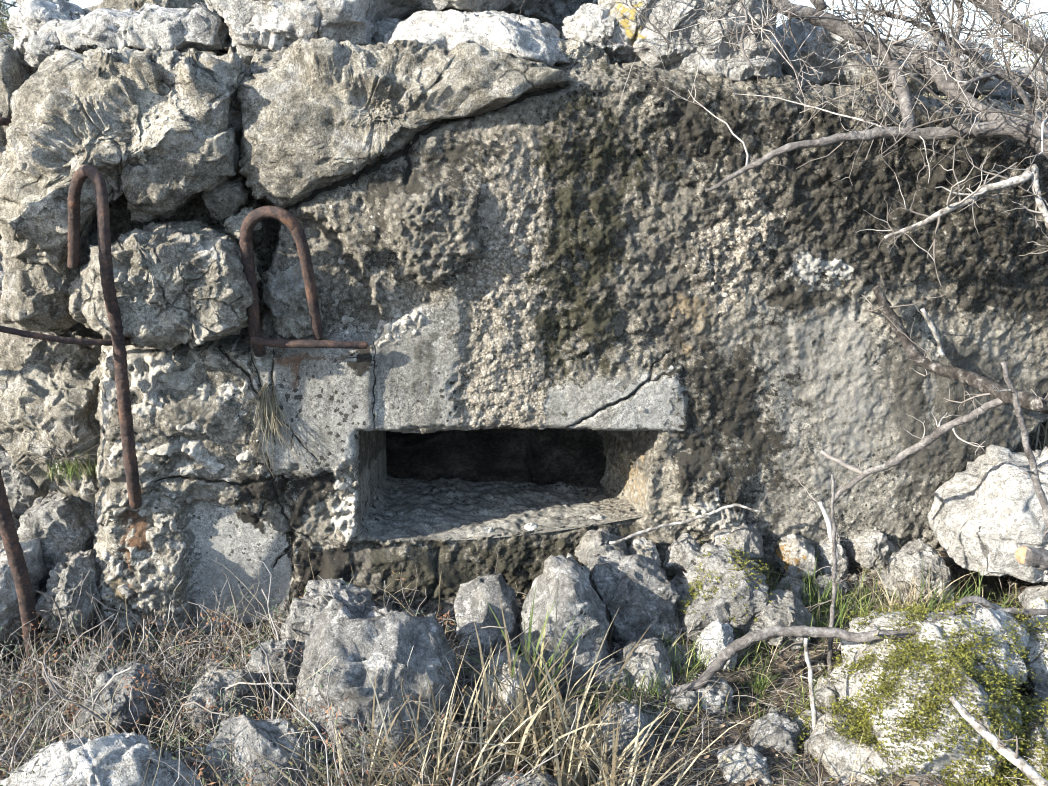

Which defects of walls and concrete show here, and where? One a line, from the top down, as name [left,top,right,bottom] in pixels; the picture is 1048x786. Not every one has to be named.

corrosion [0,165,150,602]
corrosion [239,206,368,388]
leakage [346,116,520,289]
leakage [520,85,647,381]
crack [568,352,676,427]
leakage [626,66,1048,547]
corrosion [0,469,41,656]